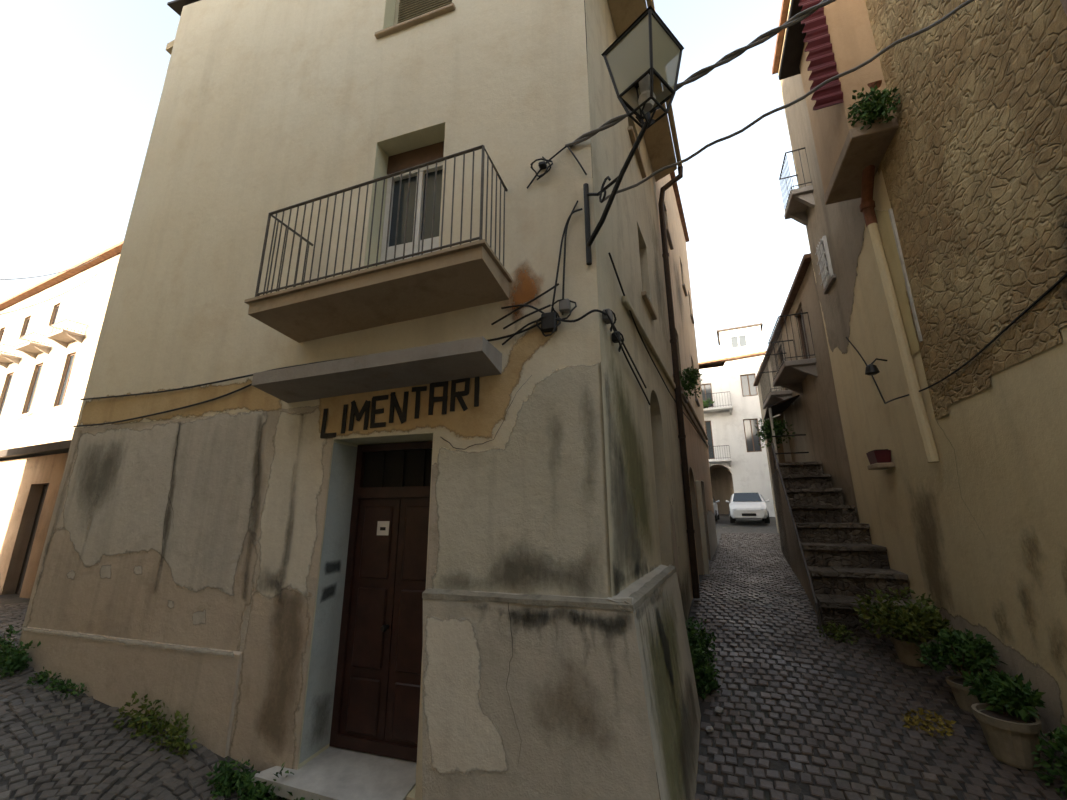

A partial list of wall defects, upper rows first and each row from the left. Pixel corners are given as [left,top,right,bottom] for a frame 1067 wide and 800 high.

rust [507,268,539,319]
peeling [63,379,281,595]
peeling [423,617,508,775]
damp [510,608,639,633]
damp [650,592,697,800]